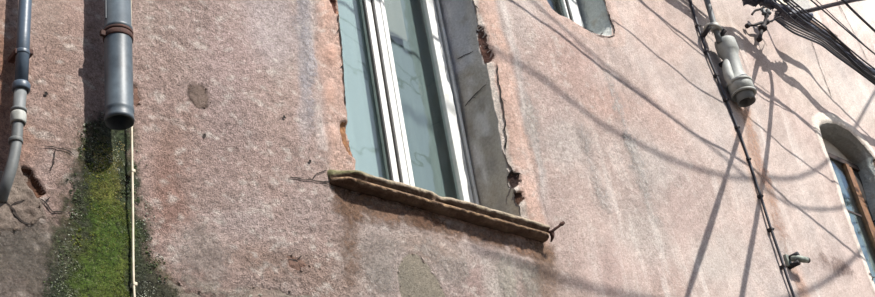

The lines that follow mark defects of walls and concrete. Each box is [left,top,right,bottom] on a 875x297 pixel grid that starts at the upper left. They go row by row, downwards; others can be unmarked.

spalling [476,25,494,63]
spalling [340,122,353,157]
crack [465,65,521,216]